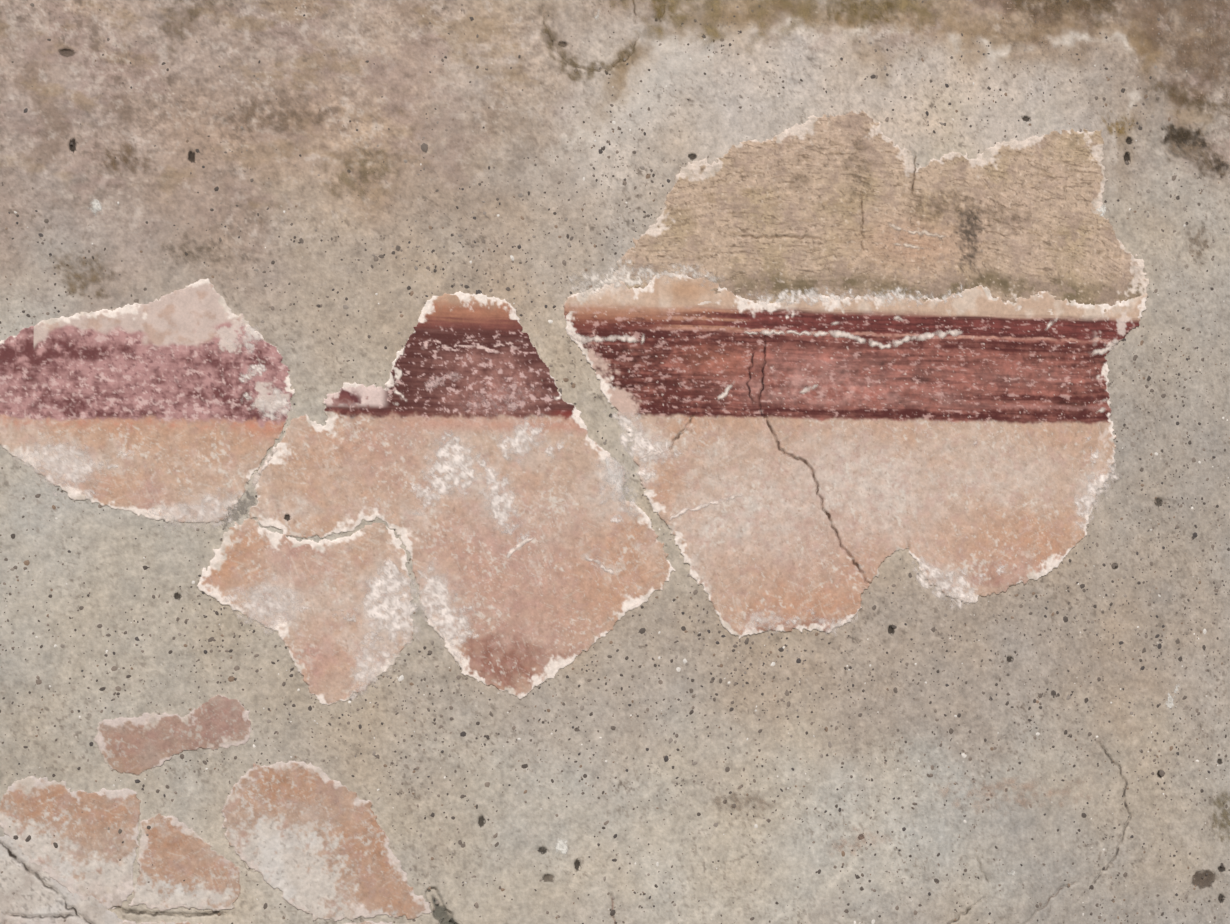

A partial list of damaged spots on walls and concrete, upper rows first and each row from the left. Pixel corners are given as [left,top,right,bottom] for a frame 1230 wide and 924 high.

leakage [545,29,614,80]
spalling [611,110,1150,296]
peeling [239,365,290,420]
peeling [410,432,529,540]
peeling [499,422,563,459]
peeling [601,414,681,523]
crack [747,343,866,580]
peeling [915,558,1004,608]
peeling [344,561,479,698]
crack [0,842,91,924]
crack [127,909,221,917]
spalling [432,897,458,924]